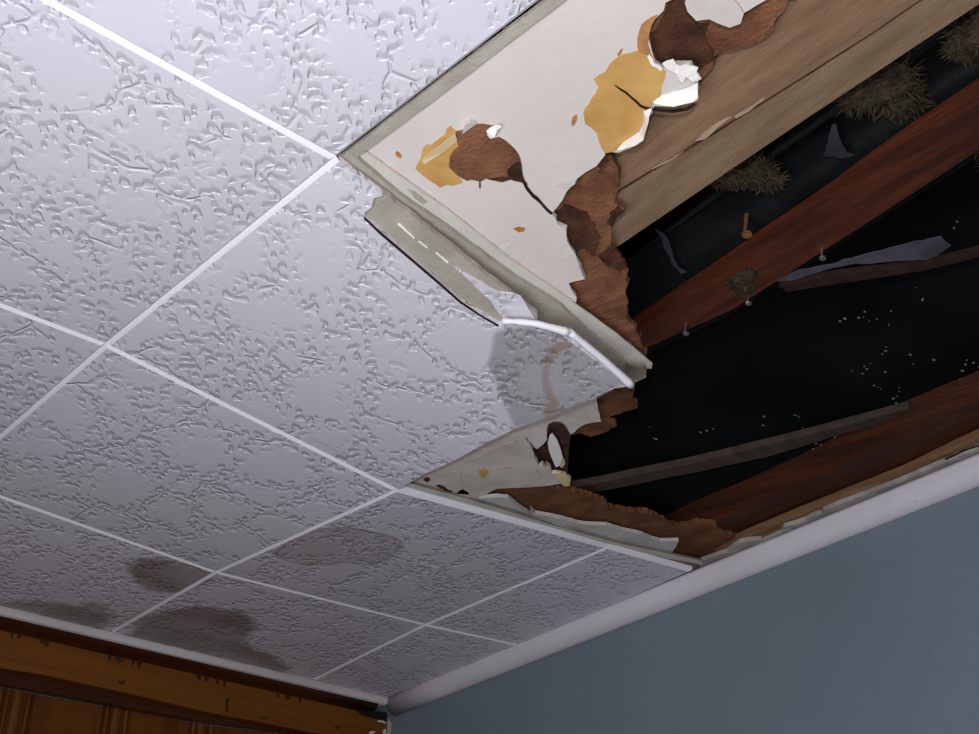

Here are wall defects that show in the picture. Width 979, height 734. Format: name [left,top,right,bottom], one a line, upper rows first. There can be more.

peeling [685,0,744,28]
peeling [571,15,701,153]
peeling [415,122,528,188]
peeling [398,223,449,263]
water stain [133,559,182,592]
water stain [172,608,250,634]